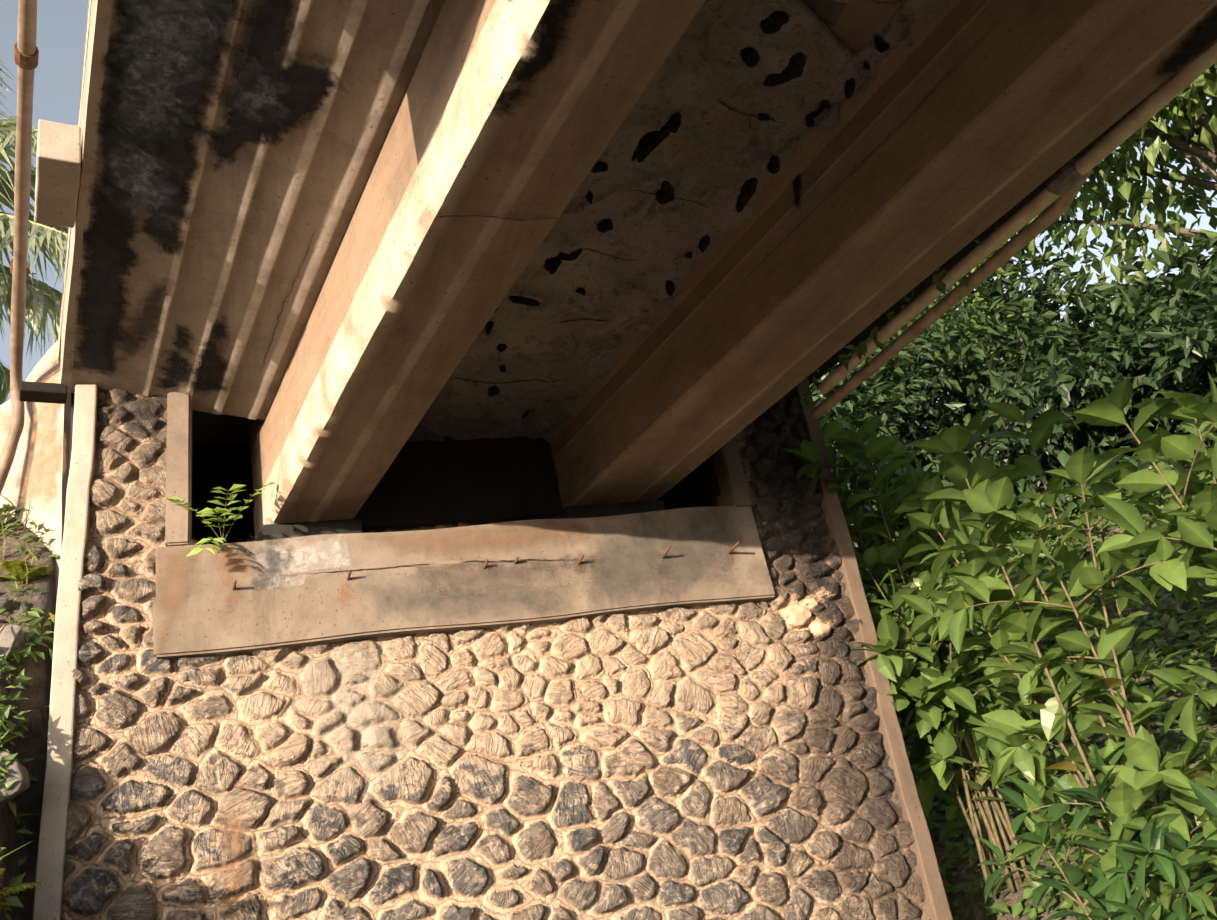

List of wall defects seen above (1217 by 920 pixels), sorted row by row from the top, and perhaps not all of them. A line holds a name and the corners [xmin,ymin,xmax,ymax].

mould [491,0,578,116]
spalling [806,100,831,127]
spalling [845,78,855,99]
damp [1156,9,1217,79]
mould [75,0,339,375]
hole [737,177,758,213]
hole [768,155,780,174]
spalling [686,235,710,259]
hole [485,308,507,372]
mould [104,316,229,440]